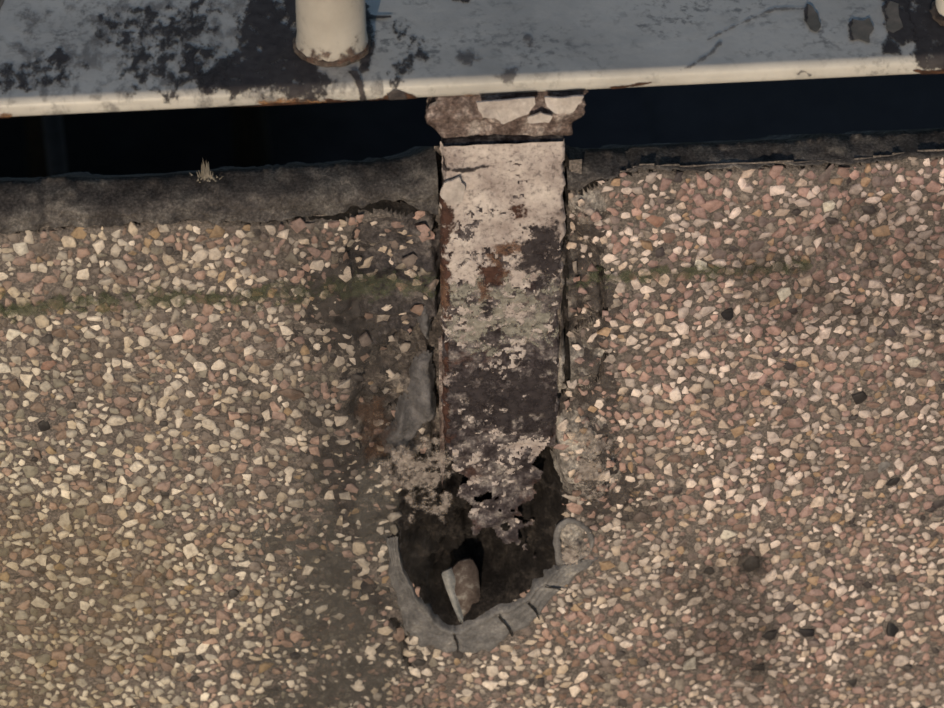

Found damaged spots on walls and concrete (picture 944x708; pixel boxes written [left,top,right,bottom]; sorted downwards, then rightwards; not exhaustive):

corrosion [300,37,367,65]
peeling [476,95,584,124]
corrosion [510,204,527,220]
corrosion [478,242,522,302]
crack [561,153,684,396]
corrosion [439,194,456,443]
spalling [345,140,610,626]
water stain [567,421,616,501]
water stain [202,357,558,708]